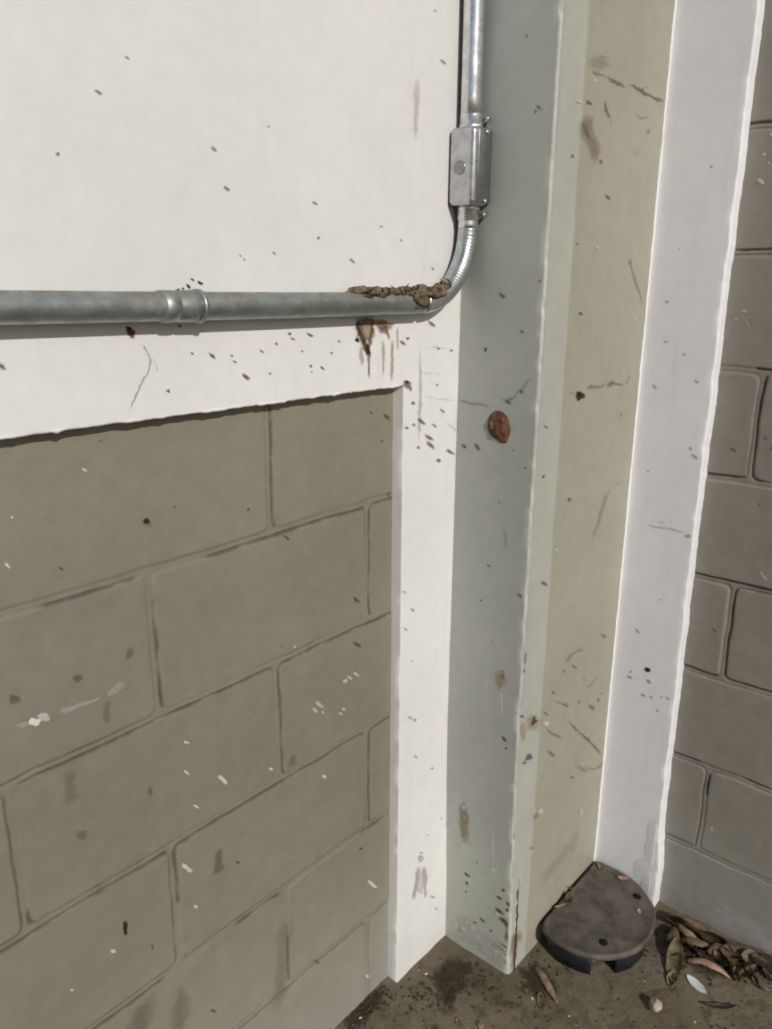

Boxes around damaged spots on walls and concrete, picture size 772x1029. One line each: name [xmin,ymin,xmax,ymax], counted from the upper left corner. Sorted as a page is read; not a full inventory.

rust [355,318,393,377]
rust [487,410,511,444]